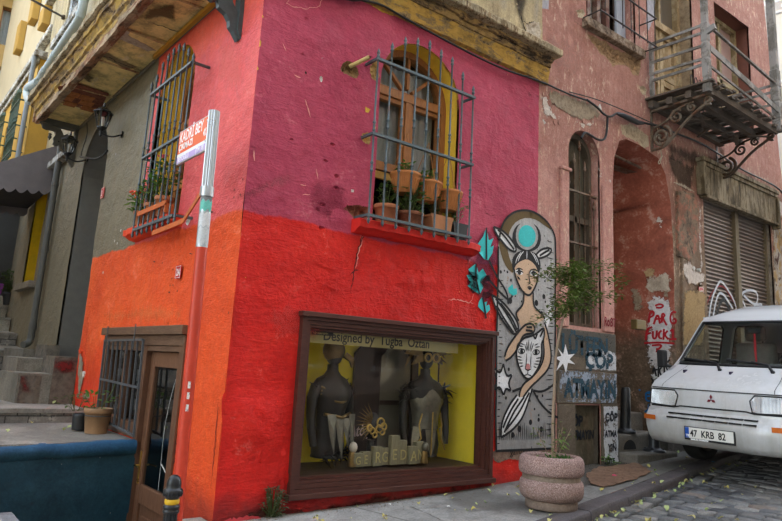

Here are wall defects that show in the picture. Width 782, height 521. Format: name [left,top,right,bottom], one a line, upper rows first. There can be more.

flaking render [542,90,602,128]
crack [350,236,364,293]
flaking render [630,268,672,312]
peeling [683,207,705,286]
spalling [76,348,90,400]